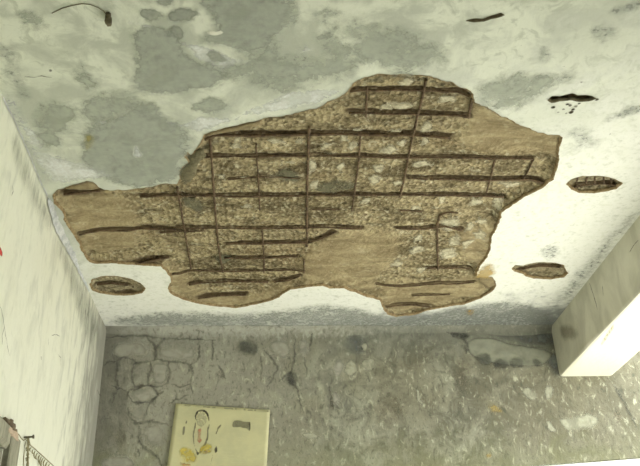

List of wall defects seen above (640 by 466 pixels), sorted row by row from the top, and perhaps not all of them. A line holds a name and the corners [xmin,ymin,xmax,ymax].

water stain [134,0,444,114]
water stain [24,102,74,147]
water stain [37,96,229,188]
spalling [3,74,568,317]
spalling [547,93,599,114]
spalling [566,176,623,193]
crack [105,335,222,466]